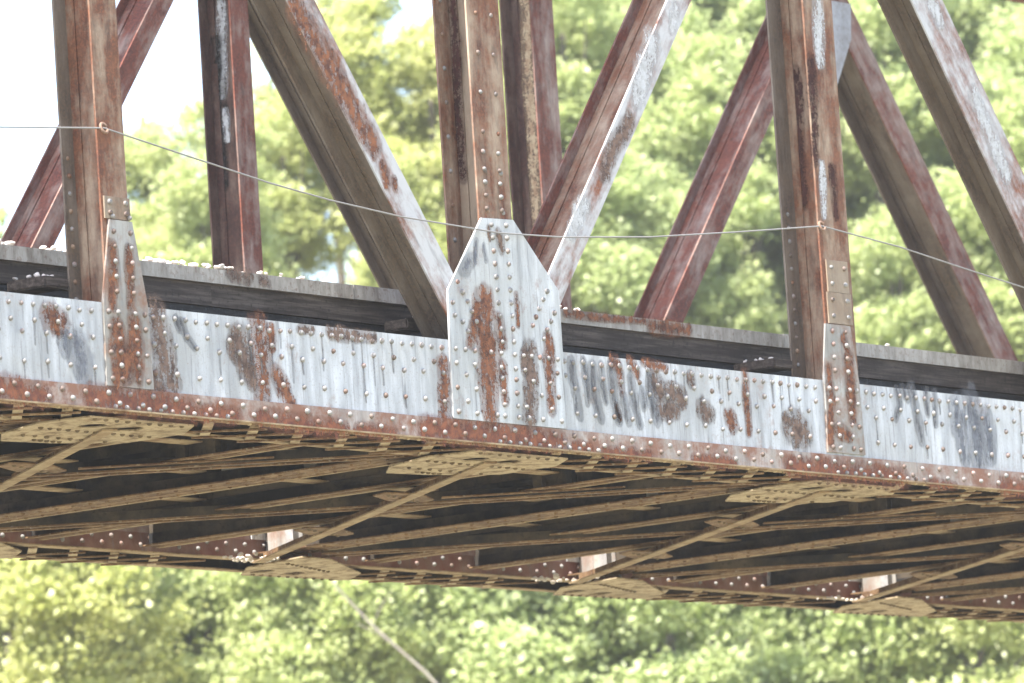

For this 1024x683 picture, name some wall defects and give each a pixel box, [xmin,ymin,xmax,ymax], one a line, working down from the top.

corrosion [288,0,398,191]
corrosion [0,374,50,408]
corrosion [40,302,72,336]
corrosion [83,241,240,425]
corrosion [226,313,397,440]
corrosion [419,284,652,462]
corrosion [609,354,669,422]
water stain [569,358,715,427]
corrosion [724,370,753,436]
corrosion [826,333,856,445]
corrosion [782,410,911,489]
water stain [895,385,994,468]